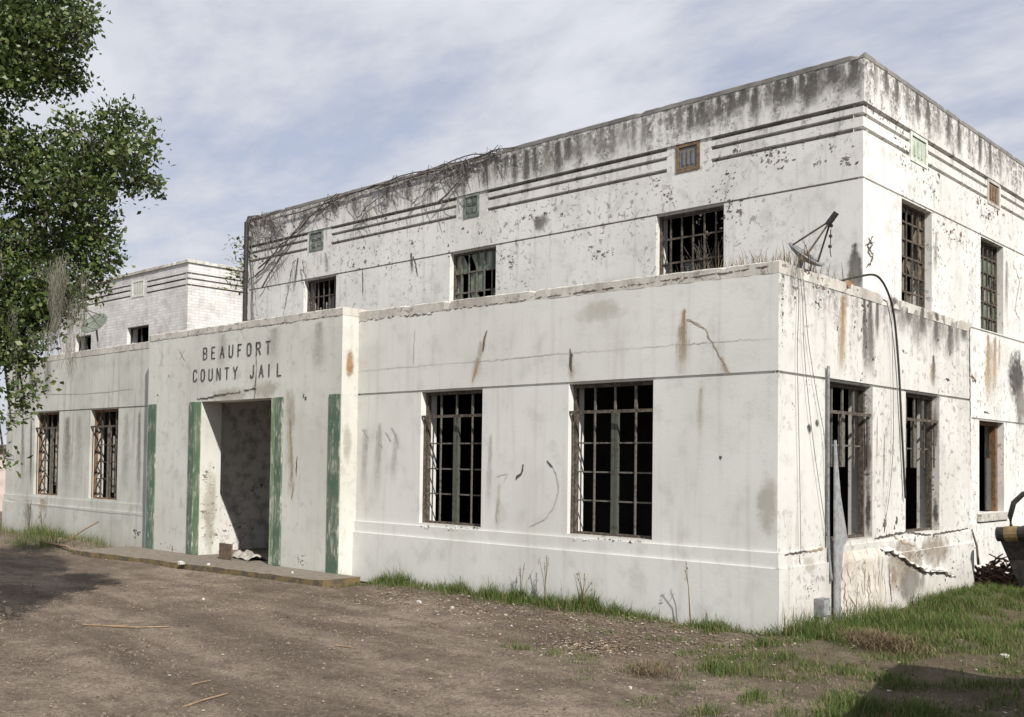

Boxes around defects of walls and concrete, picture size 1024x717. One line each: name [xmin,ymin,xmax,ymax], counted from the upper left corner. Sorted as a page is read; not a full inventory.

leakage [484,118,648,180]
peeling [733,145,795,169]
leakage [669,60,861,127]
leakage [875,64,1002,172]
rust [840,280,853,350]
crack [358,319,774,382]
rust [986,336,1000,381]
leakage [1010,353,1024,424]
flaking render [877,515,968,578]